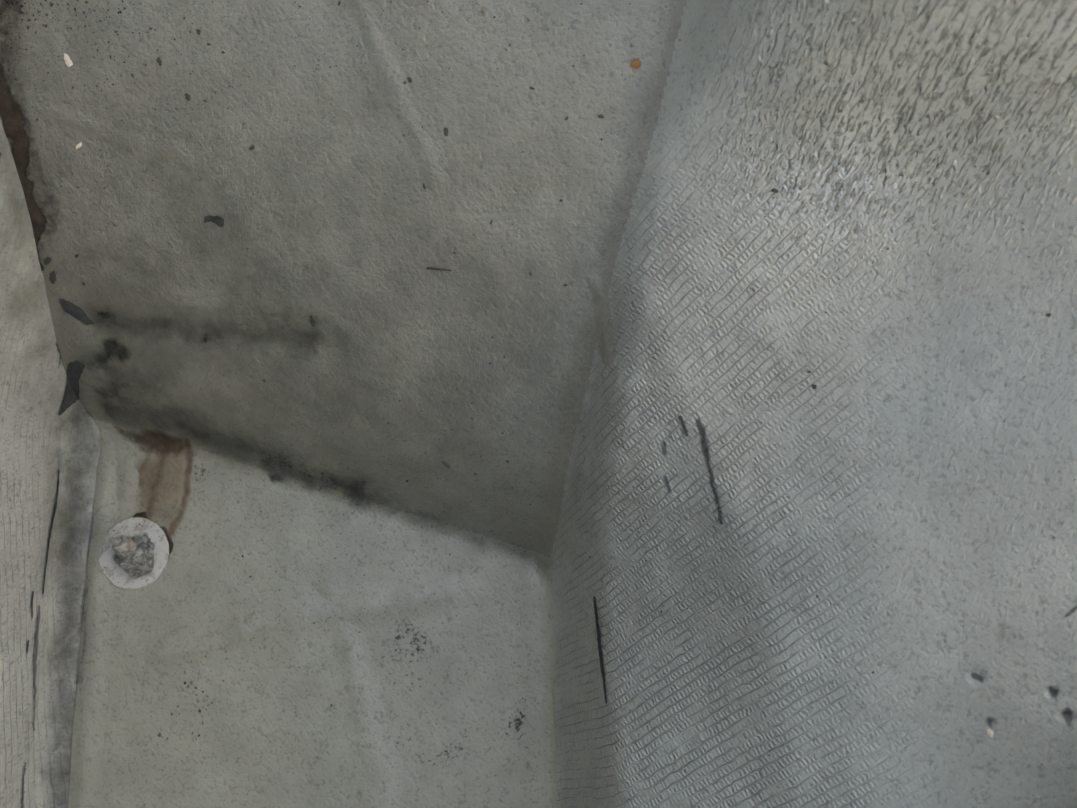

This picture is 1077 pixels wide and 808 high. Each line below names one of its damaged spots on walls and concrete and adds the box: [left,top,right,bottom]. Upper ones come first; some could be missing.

damp [100,340,129,361]
corrosion [120,430,191,557]